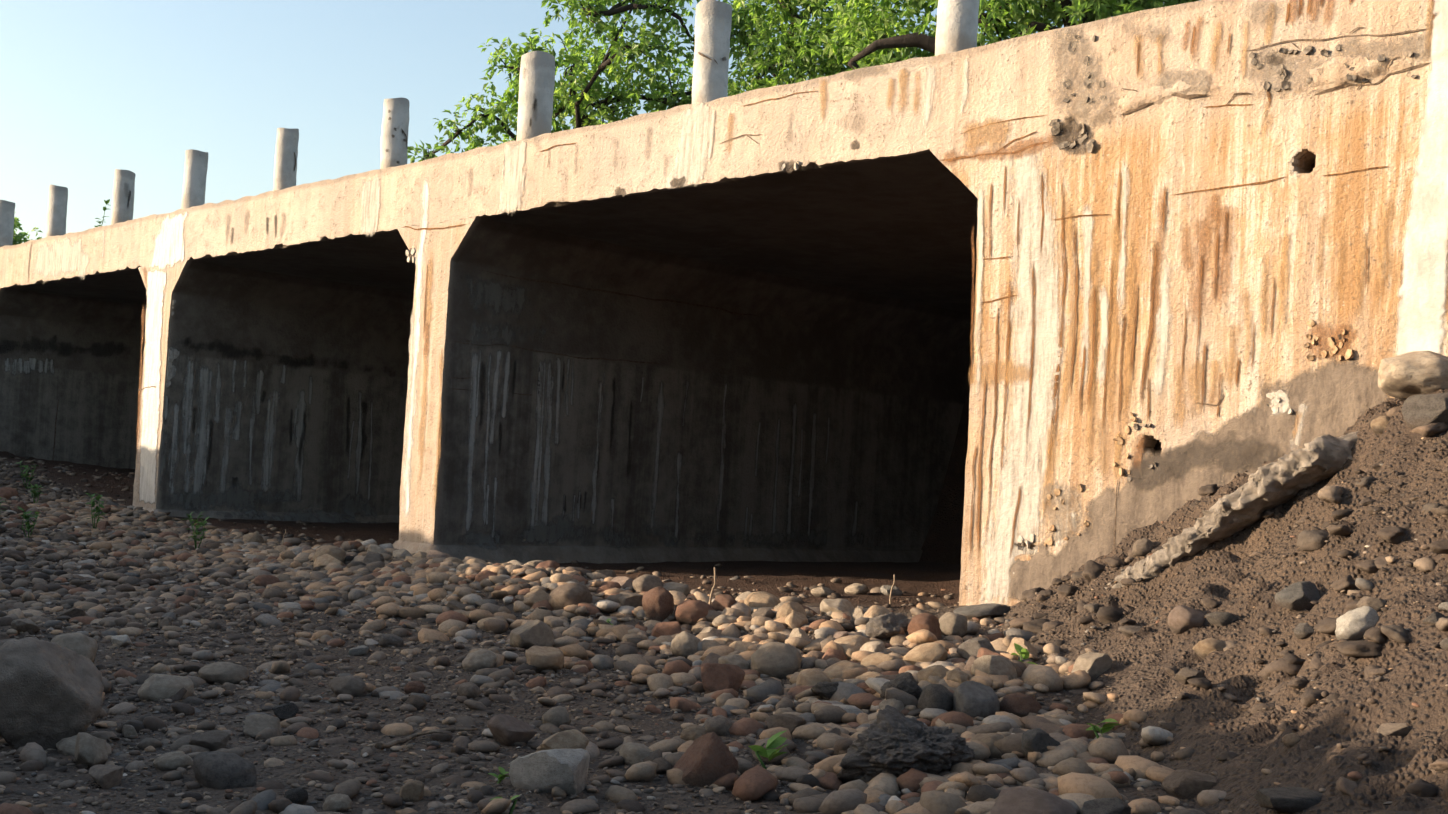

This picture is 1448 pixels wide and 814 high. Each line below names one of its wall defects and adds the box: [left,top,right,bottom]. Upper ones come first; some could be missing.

damp [139,211,378,524]
damp [361,176,380,234]
damp [403,181,429,515]
damp [975,193,983,383]
corrosion [944,120,1053,553]
spalling [1049,35,1106,154]
corrosion [1043,174,1166,506]
damp [982,153,1388,601]
corrosion [1176,196,1288,421]
corrosion [1266,0,1352,41]
spalling [1249,44,1369,92]
corrosion [1425,0,1435,52]